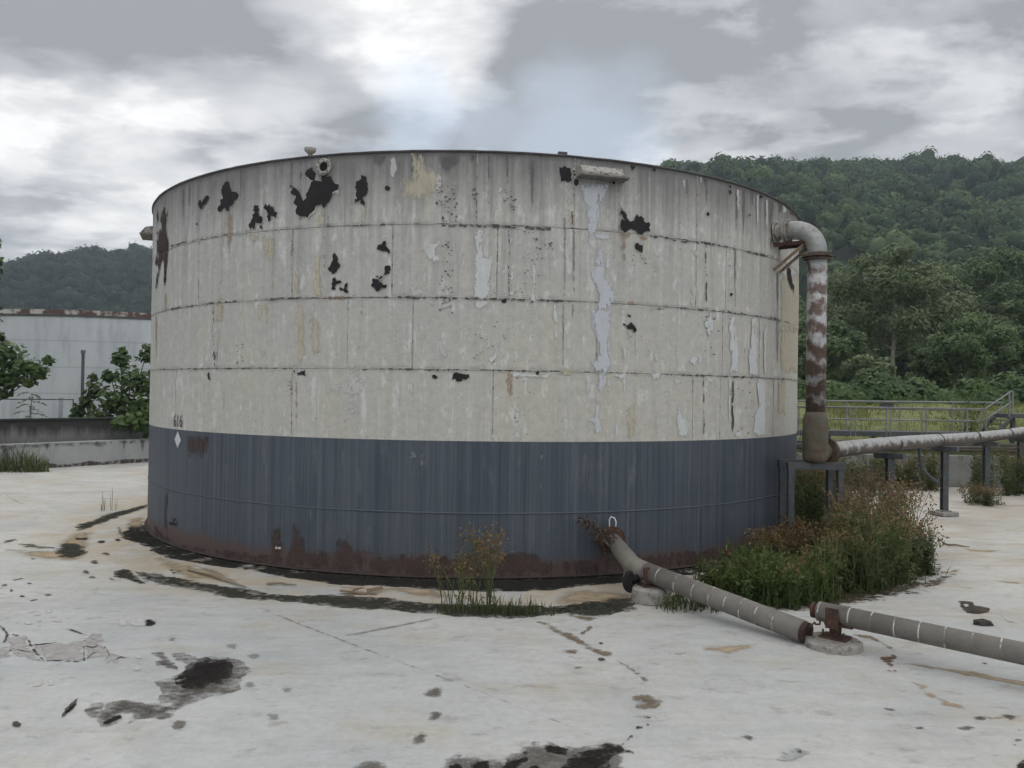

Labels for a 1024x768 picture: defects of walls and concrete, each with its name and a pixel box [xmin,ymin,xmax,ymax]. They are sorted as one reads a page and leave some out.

peeling [155,207,168,290]
peeling [198,181,238,212]
peeling [248,203,277,231]
peeling [290,167,339,220]
peeling [327,253,349,294]
peeling [371,238,392,292]
peeling [620,207,655,266]
leakage [3,504,635,619]
leakage [670,561,737,575]
spalling [0,633,119,663]